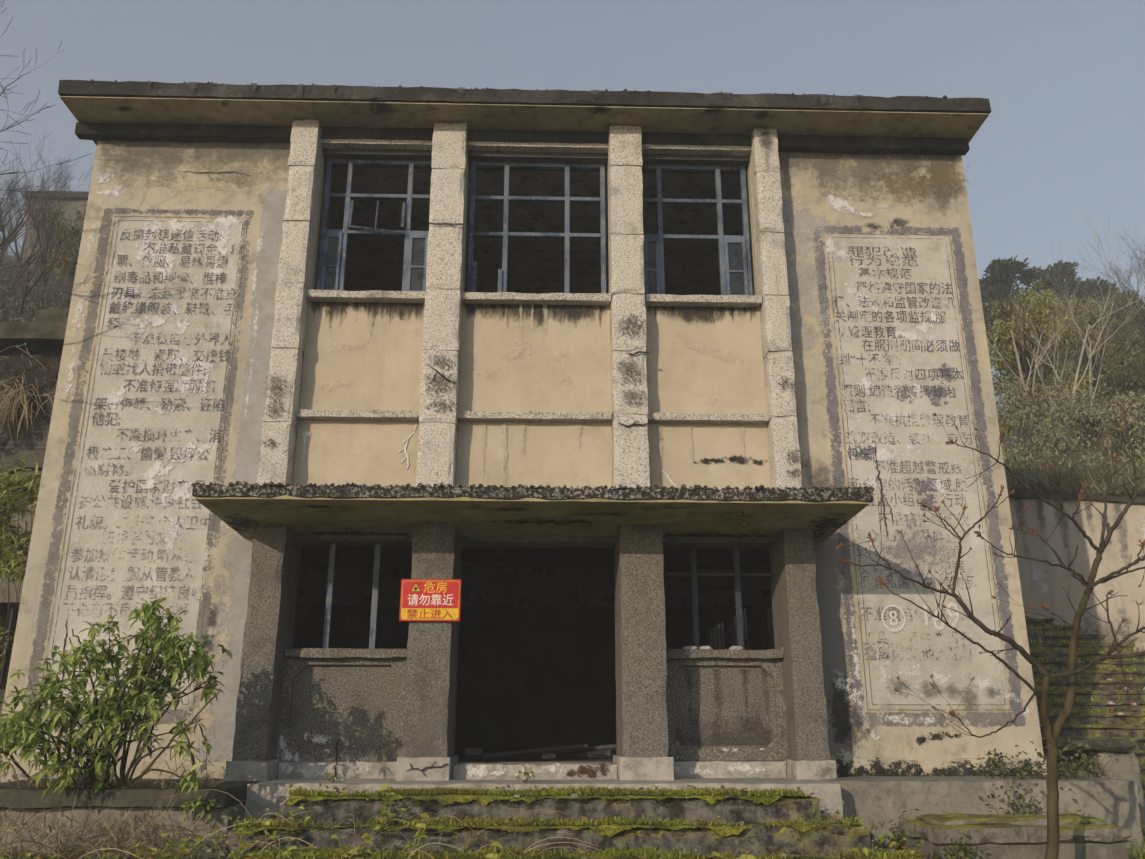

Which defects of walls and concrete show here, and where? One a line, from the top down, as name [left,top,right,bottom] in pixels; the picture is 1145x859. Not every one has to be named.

peeling [824,194,888,218]
peeling [133,214,241,279]
leakage [311,302,423,325]
leakage [465,304,606,328]
leakage [648,306,757,322]
leakage [689,427,767,465]
peeling [140,441,211,552]
leakage [835,607,1033,745]
leakage [825,755,1041,777]